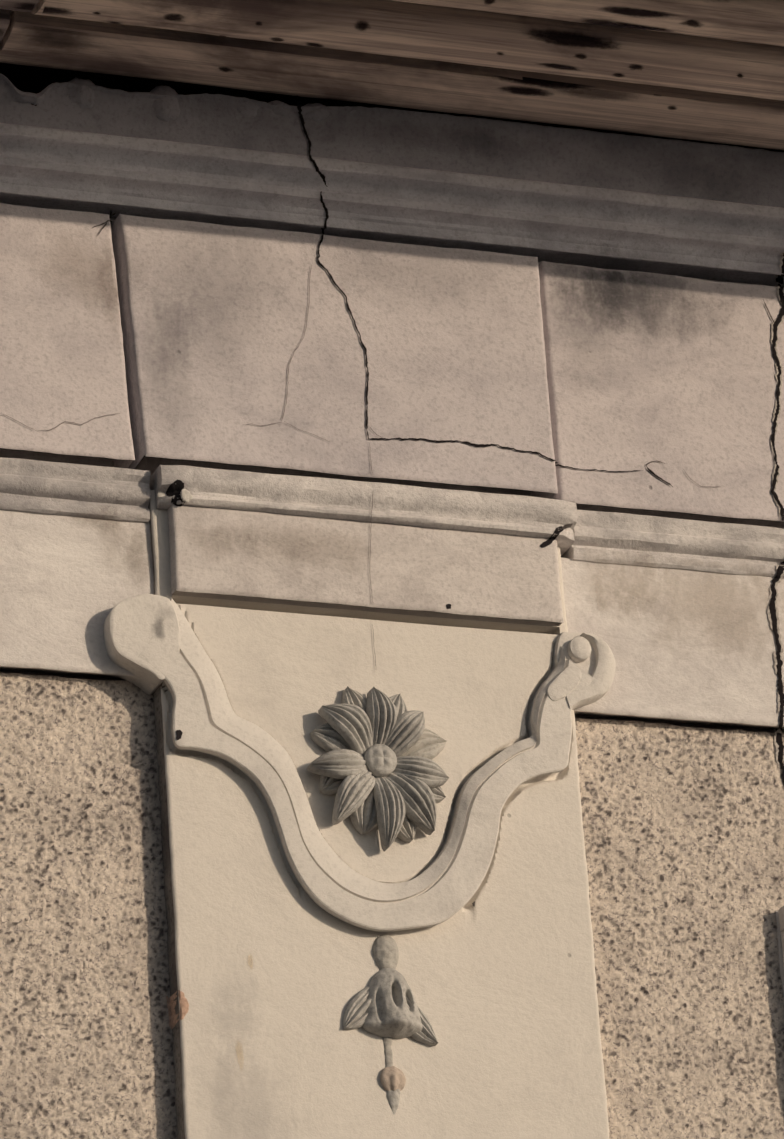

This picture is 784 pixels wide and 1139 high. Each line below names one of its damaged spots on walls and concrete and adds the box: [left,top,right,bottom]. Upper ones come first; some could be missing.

crack [0,413,120,431]
crack [246,96,719,666]
crack [763,252,784,521]
crack [767,561,784,782]